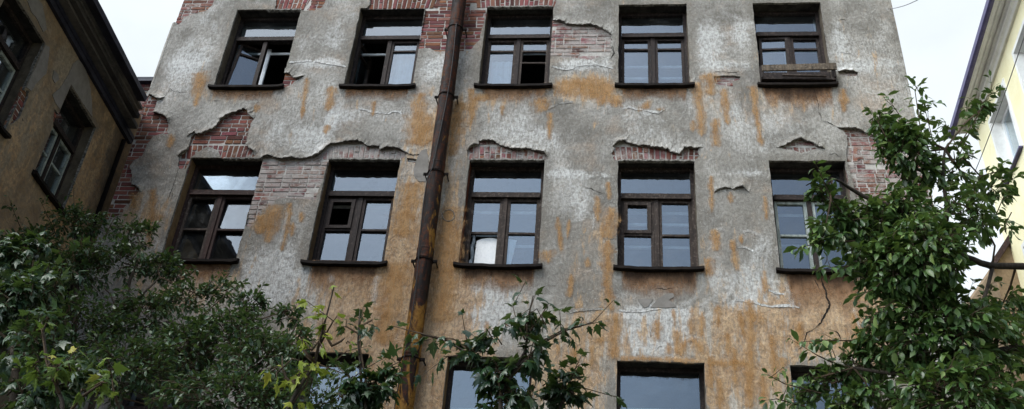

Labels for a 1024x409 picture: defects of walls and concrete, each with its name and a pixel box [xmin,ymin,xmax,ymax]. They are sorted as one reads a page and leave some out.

flaking render [369,0,452,52]
flaking render [460,0,614,59]
flaking render [106,89,173,219]
flaking render [176,100,415,227]
rust [446,89,488,155]
flaking render [465,132,550,160]
flaking render [611,132,703,161]
flaking render [776,130,826,153]
flaking render [837,119,932,207]
rust [427,207,461,321]
damp [622,271,696,294]
damp [786,274,858,308]